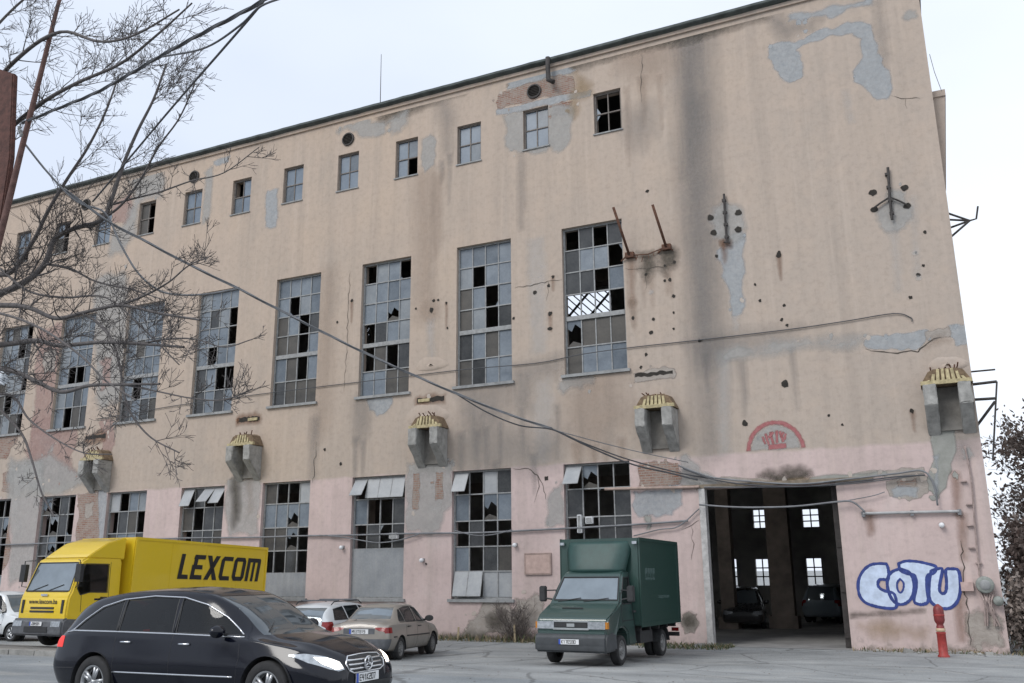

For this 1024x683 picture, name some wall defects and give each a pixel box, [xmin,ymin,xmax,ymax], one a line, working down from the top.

spalling [493,75,579,118]
peeling [0,323,109,541]
spalling [412,467,445,516]
water stain [763,468,887,485]
spalling [2,515,11,570]